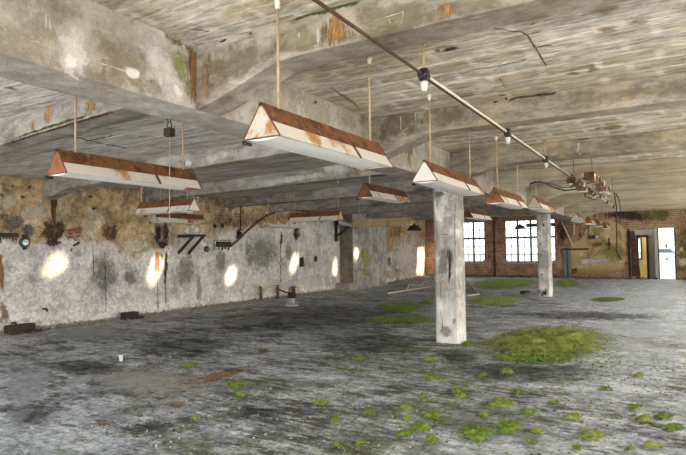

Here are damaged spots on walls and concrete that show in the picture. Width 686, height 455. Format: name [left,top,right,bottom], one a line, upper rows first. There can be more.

rust [328,15,345,45]
crack [471,23,553,77]
rust [190,52,210,96]
flaking render [170,223,224,258]
rust [154,252,168,284]
water stain [439,250,451,297]